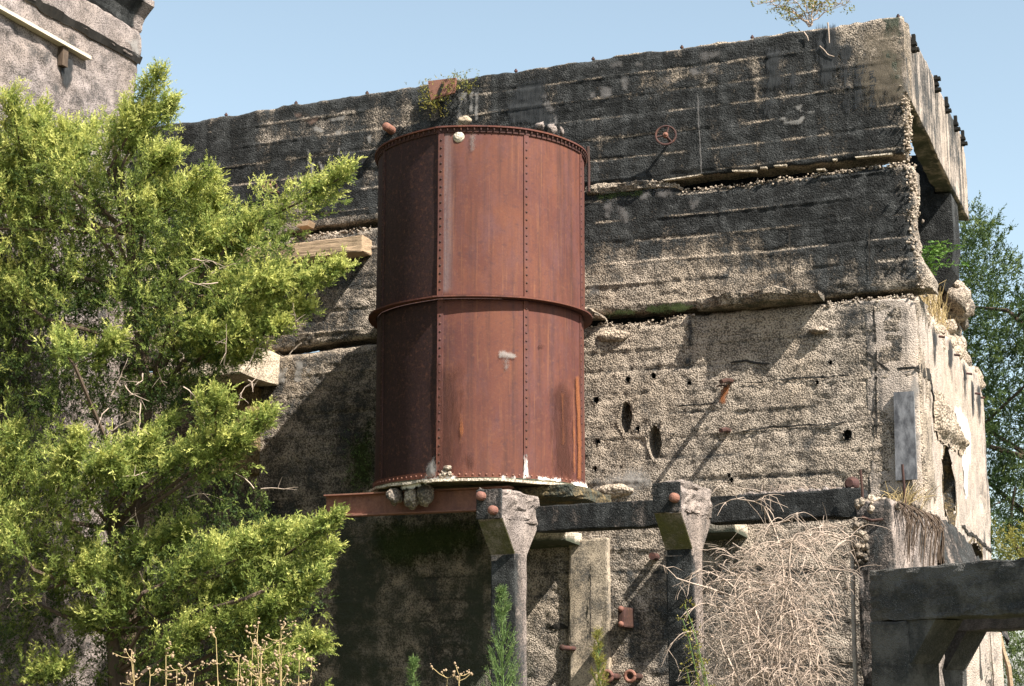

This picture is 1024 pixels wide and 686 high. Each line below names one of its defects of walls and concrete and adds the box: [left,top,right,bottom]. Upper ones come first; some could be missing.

spalling [899,85,928,298]
corrosion [553,377,581,479]
spalling [932,390,970,457]
spalling [932,323,985,423]